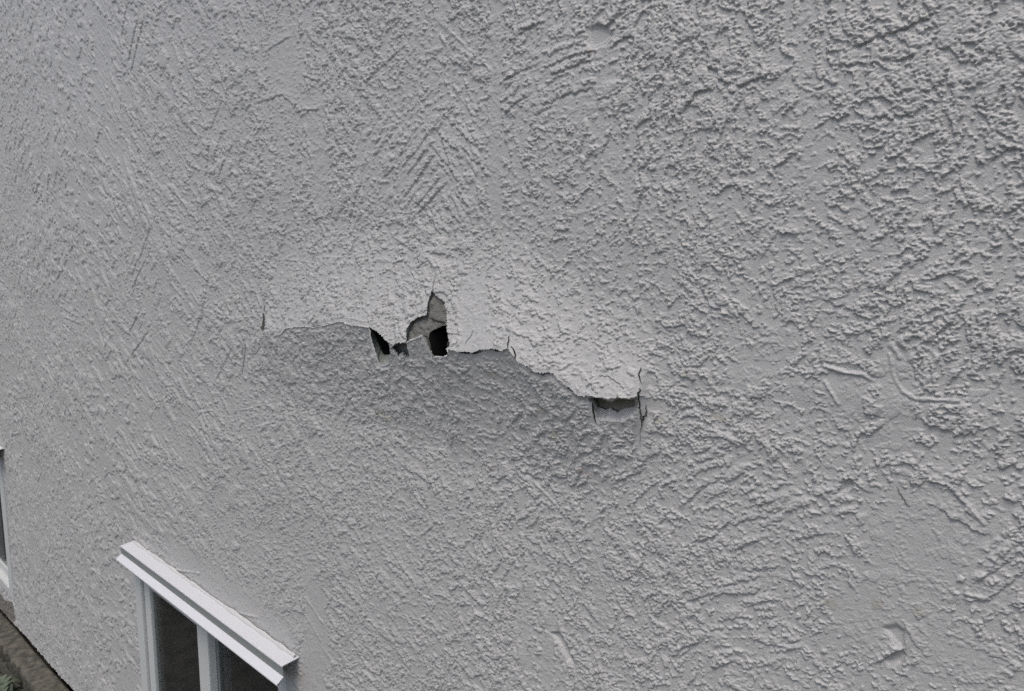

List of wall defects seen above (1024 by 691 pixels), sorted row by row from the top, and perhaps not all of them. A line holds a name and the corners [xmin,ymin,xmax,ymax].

spalling [369,291,450,367]
spalling [588,396,639,422]
crack [599,368,647,443]